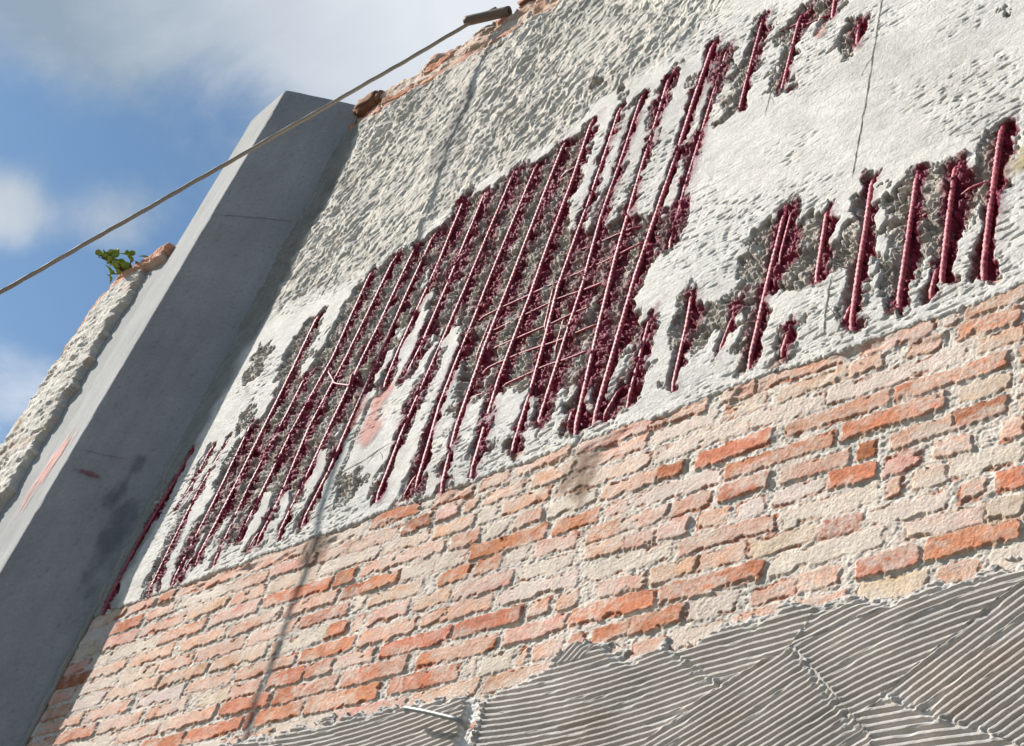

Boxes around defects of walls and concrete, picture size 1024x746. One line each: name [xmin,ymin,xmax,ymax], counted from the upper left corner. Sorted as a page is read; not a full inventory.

crack [852,1,882,175]
corrosion [143,37,733,597]
spalling [101,0,1021,615]
corrosion [717,197,802,368]
corrosion [810,203,838,285]
corrosion [841,169,881,333]
corrosion [886,119,1024,314]